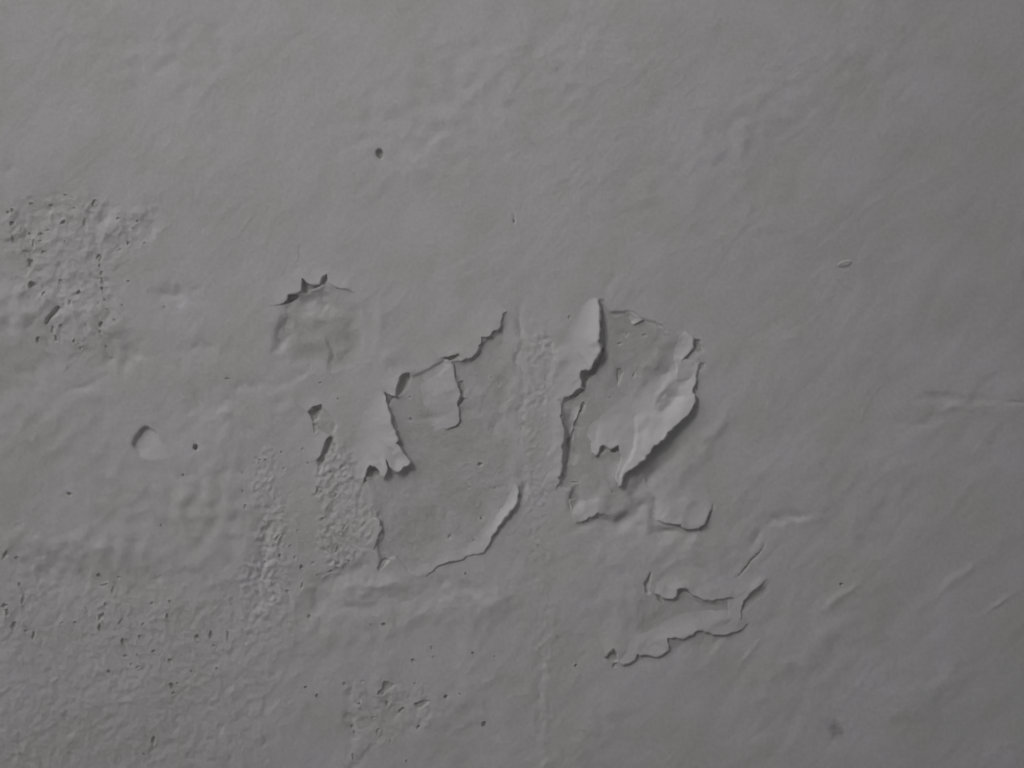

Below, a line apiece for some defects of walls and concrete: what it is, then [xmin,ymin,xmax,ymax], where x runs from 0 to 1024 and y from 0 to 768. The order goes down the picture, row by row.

peeling [298,297,712,579]
peeling [600,570,773,670]